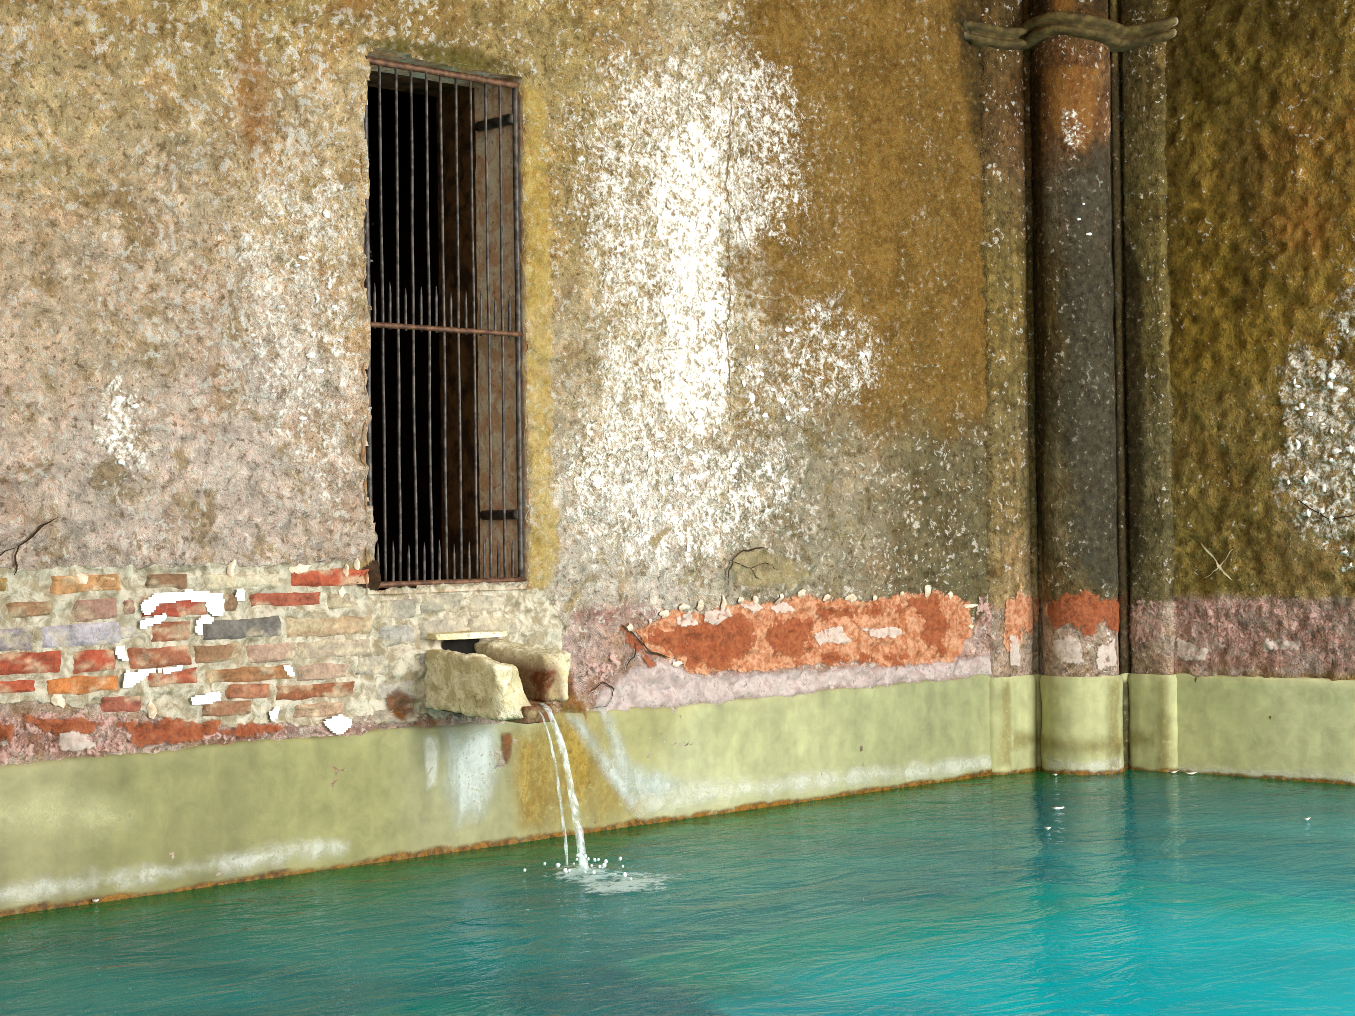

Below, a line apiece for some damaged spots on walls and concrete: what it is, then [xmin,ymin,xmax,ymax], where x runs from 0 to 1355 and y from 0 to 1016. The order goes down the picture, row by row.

leakage [557,0,987,570]
leakage [1272,283,1355,571]
crack [0,517,58,575]
flaking render [0,556,563,764]
peeling [585,585,1355,714]